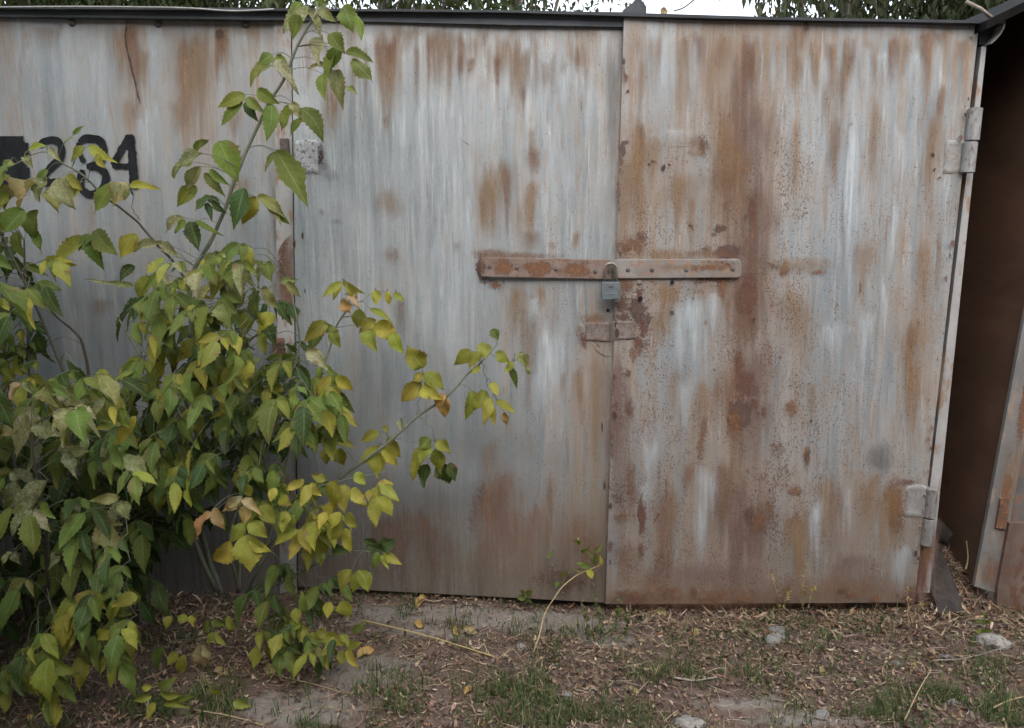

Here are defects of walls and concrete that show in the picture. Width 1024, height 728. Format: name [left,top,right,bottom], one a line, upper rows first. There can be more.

corrosion [215,25,228,68]
corrosion [365,40,393,101]
corrosion [930,36,973,179]
corrosion [526,184,534,225]
corrosion [475,241,592,300]
corrosion [615,125,828,346]
corrosion [864,466,931,543]
corrosion [916,536,937,608]